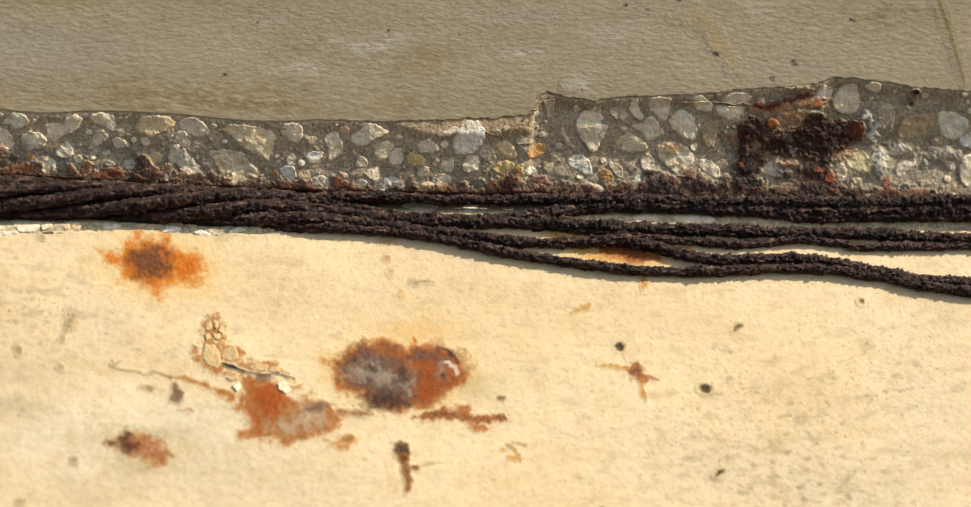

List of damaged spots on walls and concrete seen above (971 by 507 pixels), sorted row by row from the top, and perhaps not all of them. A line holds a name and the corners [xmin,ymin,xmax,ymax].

spalling [0,87,797,215]
rust [0,85,970,205]
spalling [793,77,971,198]
spalling [0,218,277,236]
rust [80,222,238,313]
rust [539,230,699,292]
spalling [569,211,971,232]
rust [84,236,510,497]
rust [595,359,661,401]